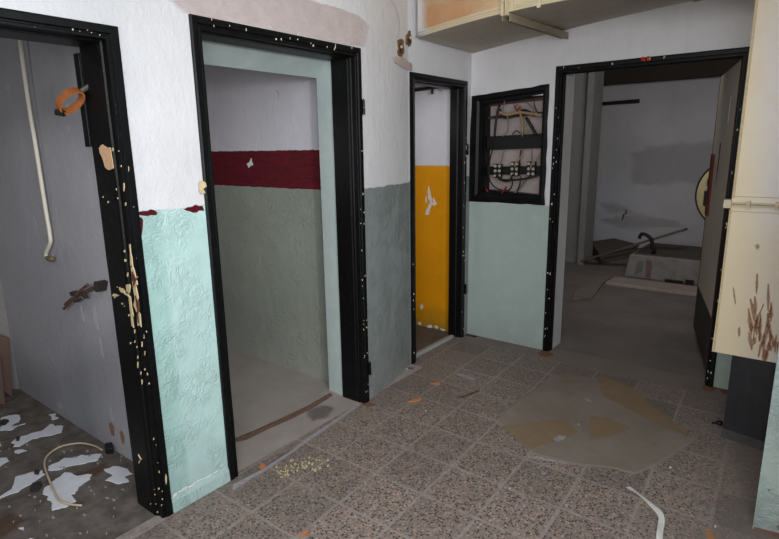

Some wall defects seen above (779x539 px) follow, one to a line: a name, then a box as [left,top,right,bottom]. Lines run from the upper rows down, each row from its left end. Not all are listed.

peeling [99,145,129,172]
peeling [112,244,150,385]
rust [738,274,779,361]